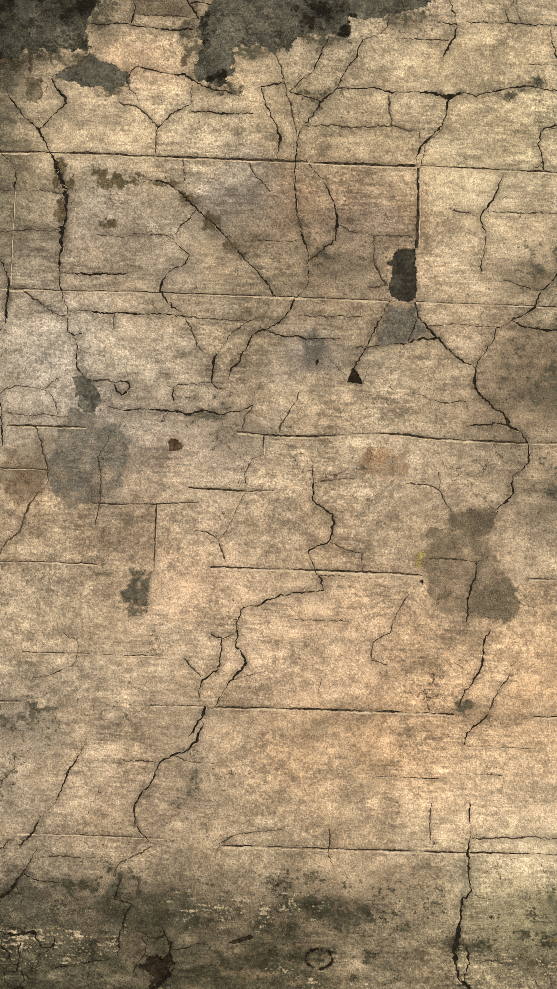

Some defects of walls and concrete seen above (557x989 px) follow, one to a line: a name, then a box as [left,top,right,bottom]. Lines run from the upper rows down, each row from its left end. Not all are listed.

spalling [0,0,131,91]
spalling [192,0,430,87]
crack [0,0,557,562]
spalling [387,249,417,302]
peeling [347,368,362,384]
leakage [491,337,557,464]
leakage [422,498,521,623]
crack [0,465,363,989]
crack [459,630,510,745]
leakage [0,844,446,989]
leakage [437,916,557,976]
crack [452,804,557,989]